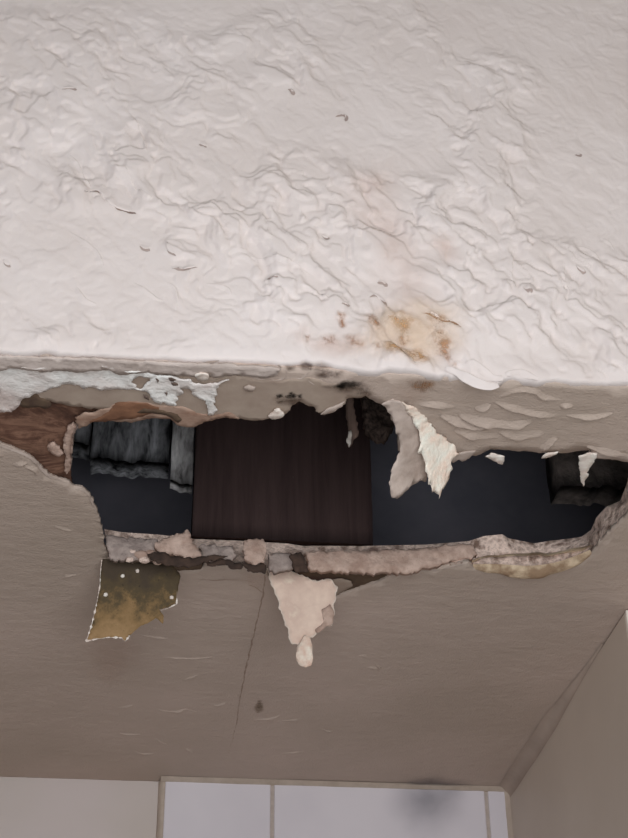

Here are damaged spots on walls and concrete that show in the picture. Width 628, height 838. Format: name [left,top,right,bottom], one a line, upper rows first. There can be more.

peeling [0,355,366,444]
spalling [485,449,505,465]
spalling [578,450,628,487]
spalling [100,481,628,595]
crack [228,576,266,753]